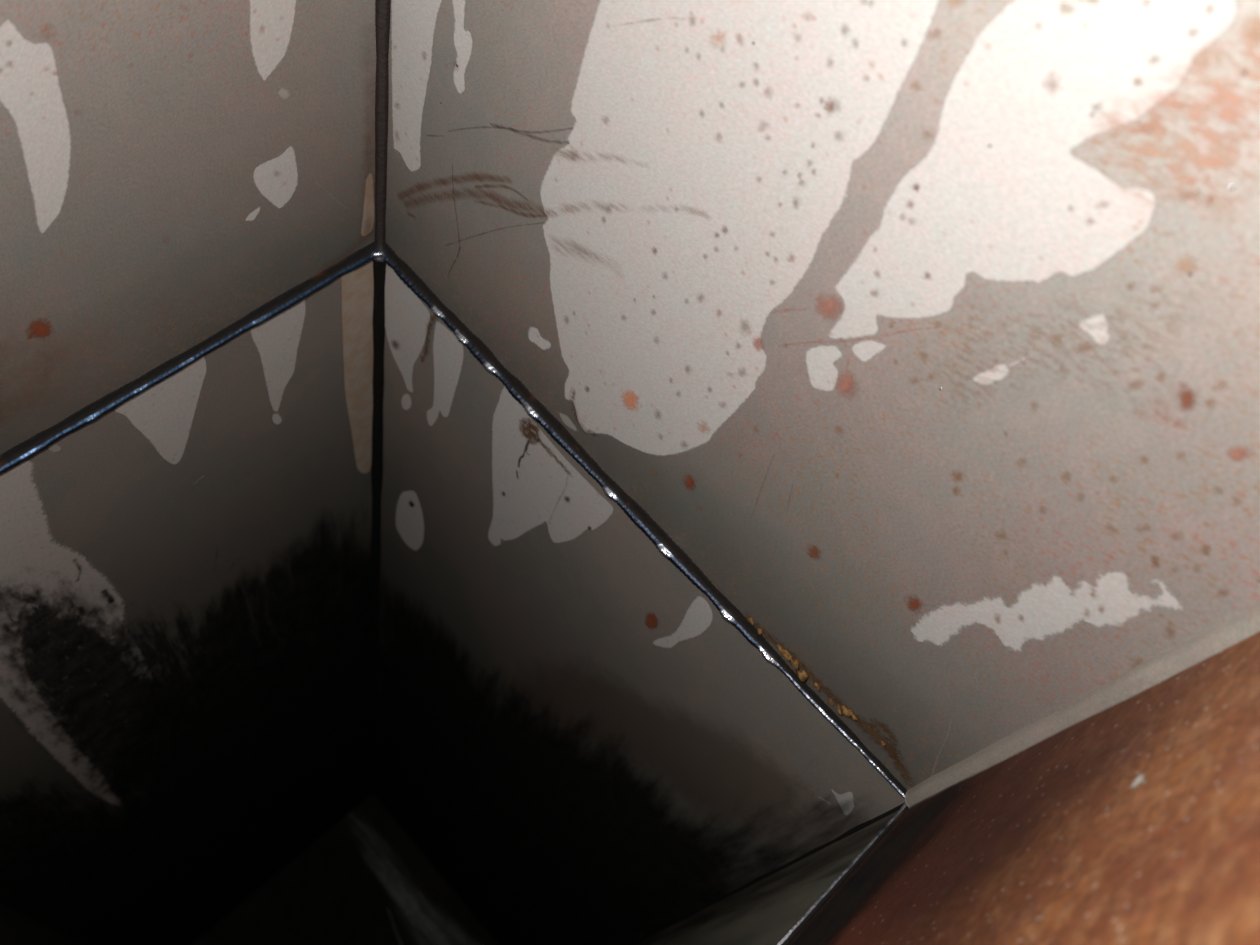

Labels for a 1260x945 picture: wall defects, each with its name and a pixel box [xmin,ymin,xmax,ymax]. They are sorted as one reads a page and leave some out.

peeling [0,19,71,233]
peeling [249,0,296,81]
peeling [391,0,473,172]
peeling [528,0,939,456]
peeling [806,0,1237,391]
corrosion [1132,47,1260,190]
peeling [115,355,207,464]
peeling [251,298,306,424]
peeling [488,387,613,546]
peeling [0,460,153,807]
corrosion [747,617,911,781]
peeling [910,571,1183,651]